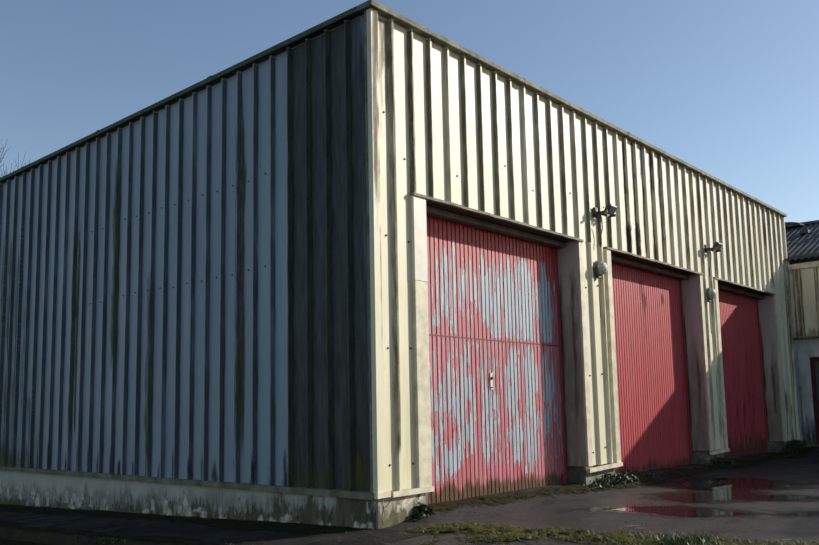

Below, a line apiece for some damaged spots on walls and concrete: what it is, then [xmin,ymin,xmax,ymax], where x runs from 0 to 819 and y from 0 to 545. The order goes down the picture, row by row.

damp [191,12,417,529]
damp [426,39,434,197]
damp [460,57,469,207]
damp [476,65,485,212]
damp [492,72,500,216]
damp [534,94,567,232]
damp [582,120,613,248]
damp [622,138,664,260]
peeling [427,243,562,484]
damp [559,291,568,466]
damp [428,469,564,504]